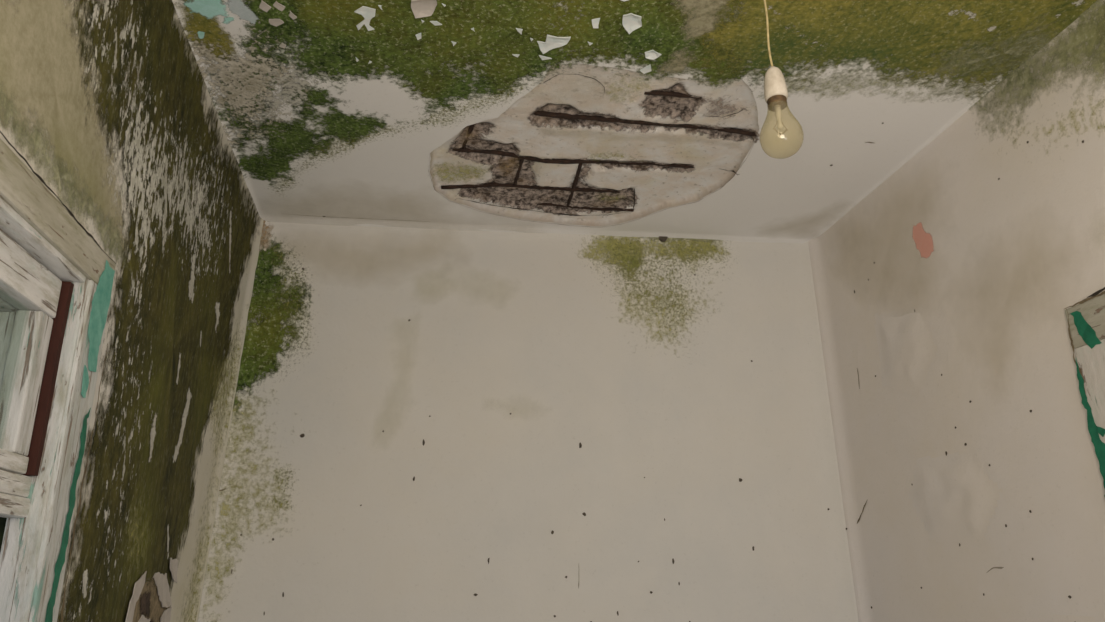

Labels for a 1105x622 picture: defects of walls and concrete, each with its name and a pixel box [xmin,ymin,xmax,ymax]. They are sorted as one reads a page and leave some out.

peeling [354,5,382,31]
peeling [411,0,446,40]
peeling [621,0,642,34]
leakage [238,0,1105,124]
spalling [429,28,760,227]
flaking render [0,0,319,622]
leakage [0,0,399,622]
leakage [584,236,728,341]